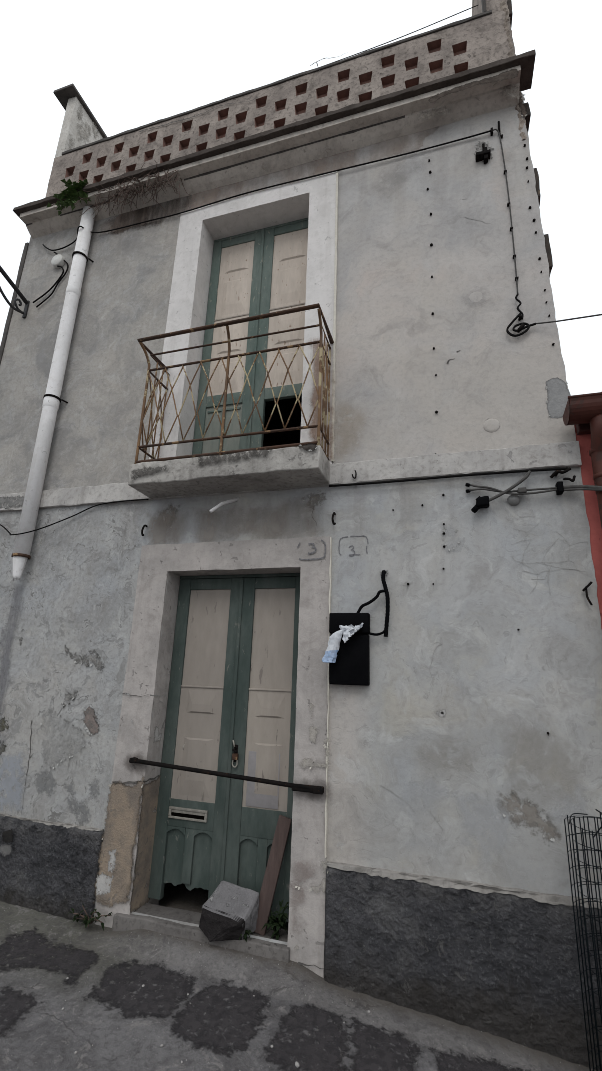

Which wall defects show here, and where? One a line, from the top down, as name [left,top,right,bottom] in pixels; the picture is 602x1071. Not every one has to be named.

spalling [545,378,571,418]
spalling [48,690,99,747]
spalling [94,776,160,912]
spalling [498,791,560,842]